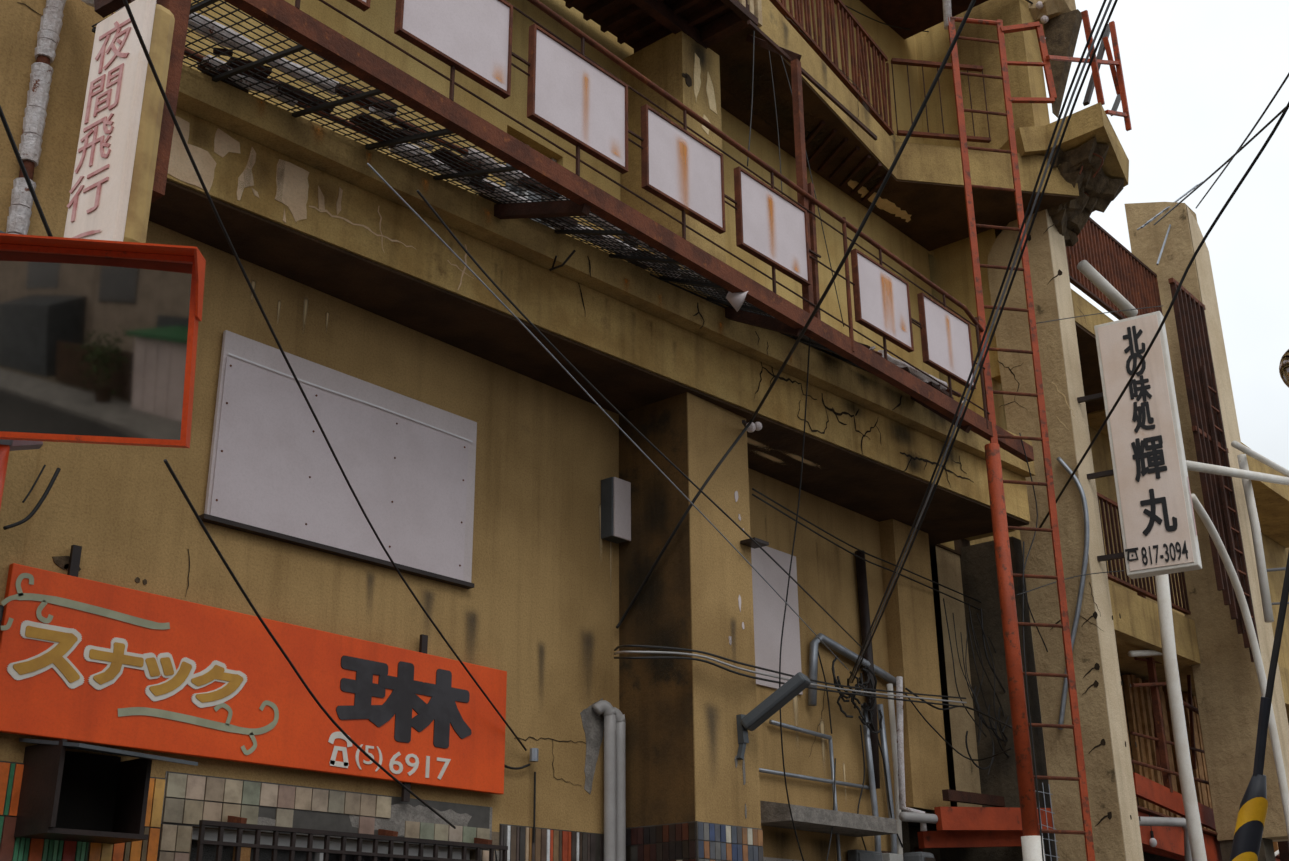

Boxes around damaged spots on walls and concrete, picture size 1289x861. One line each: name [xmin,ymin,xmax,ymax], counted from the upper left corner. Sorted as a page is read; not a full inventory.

peeling [168,116,259,200]
peeling [275,159,343,223]
crack [514,736,585,786]